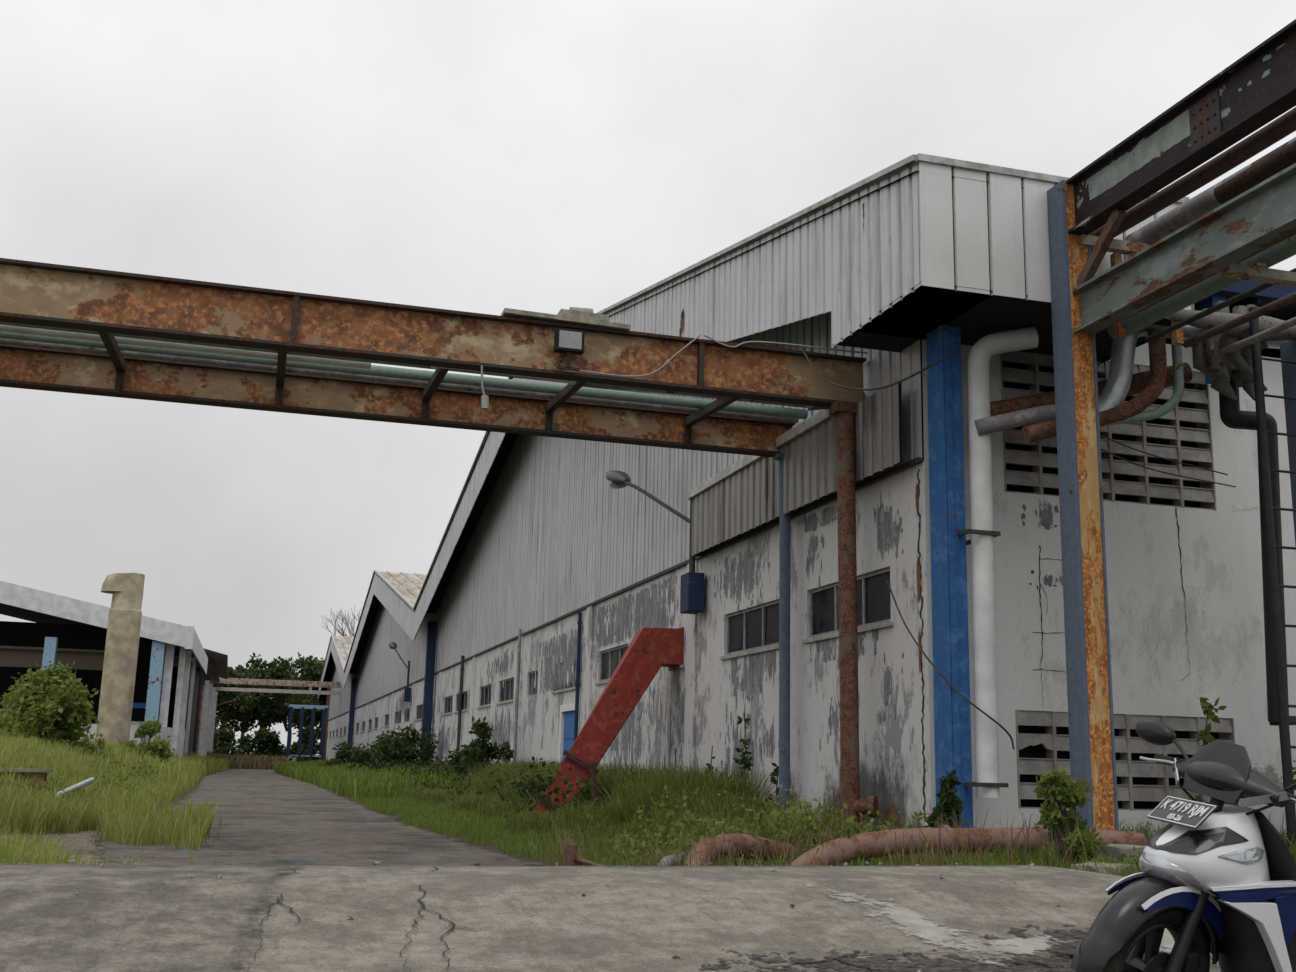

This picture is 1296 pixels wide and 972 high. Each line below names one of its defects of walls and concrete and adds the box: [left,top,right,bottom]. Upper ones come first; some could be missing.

peeling [1219,44,1284,95]
peeling [1077,109,1190,208]
crack [246,869,300,972]
crack [400,866,487,972]